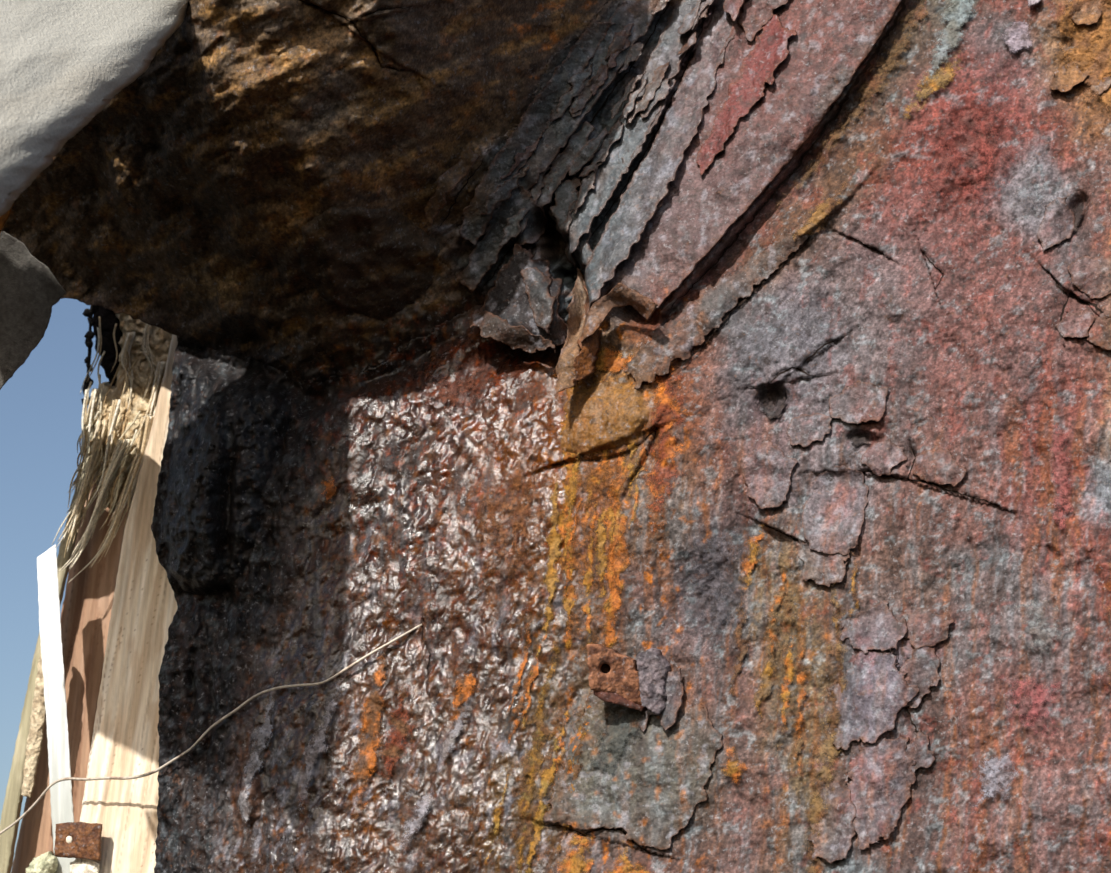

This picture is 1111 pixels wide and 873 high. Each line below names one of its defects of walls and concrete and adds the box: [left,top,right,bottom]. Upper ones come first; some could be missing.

peeling [696,0,797,176]
rust [1050,0,1111,111]
peeling [625,221,810,389]
crack [771,340,835,382]
crack [554,429,656,485]
crack [760,522,799,542]
peeling [740,380,967,587]
crack [835,446,996,505]
rust [470,365,687,873]
rust [351,646,415,819]
rust [753,553,859,873]
peeling [808,600,955,864]